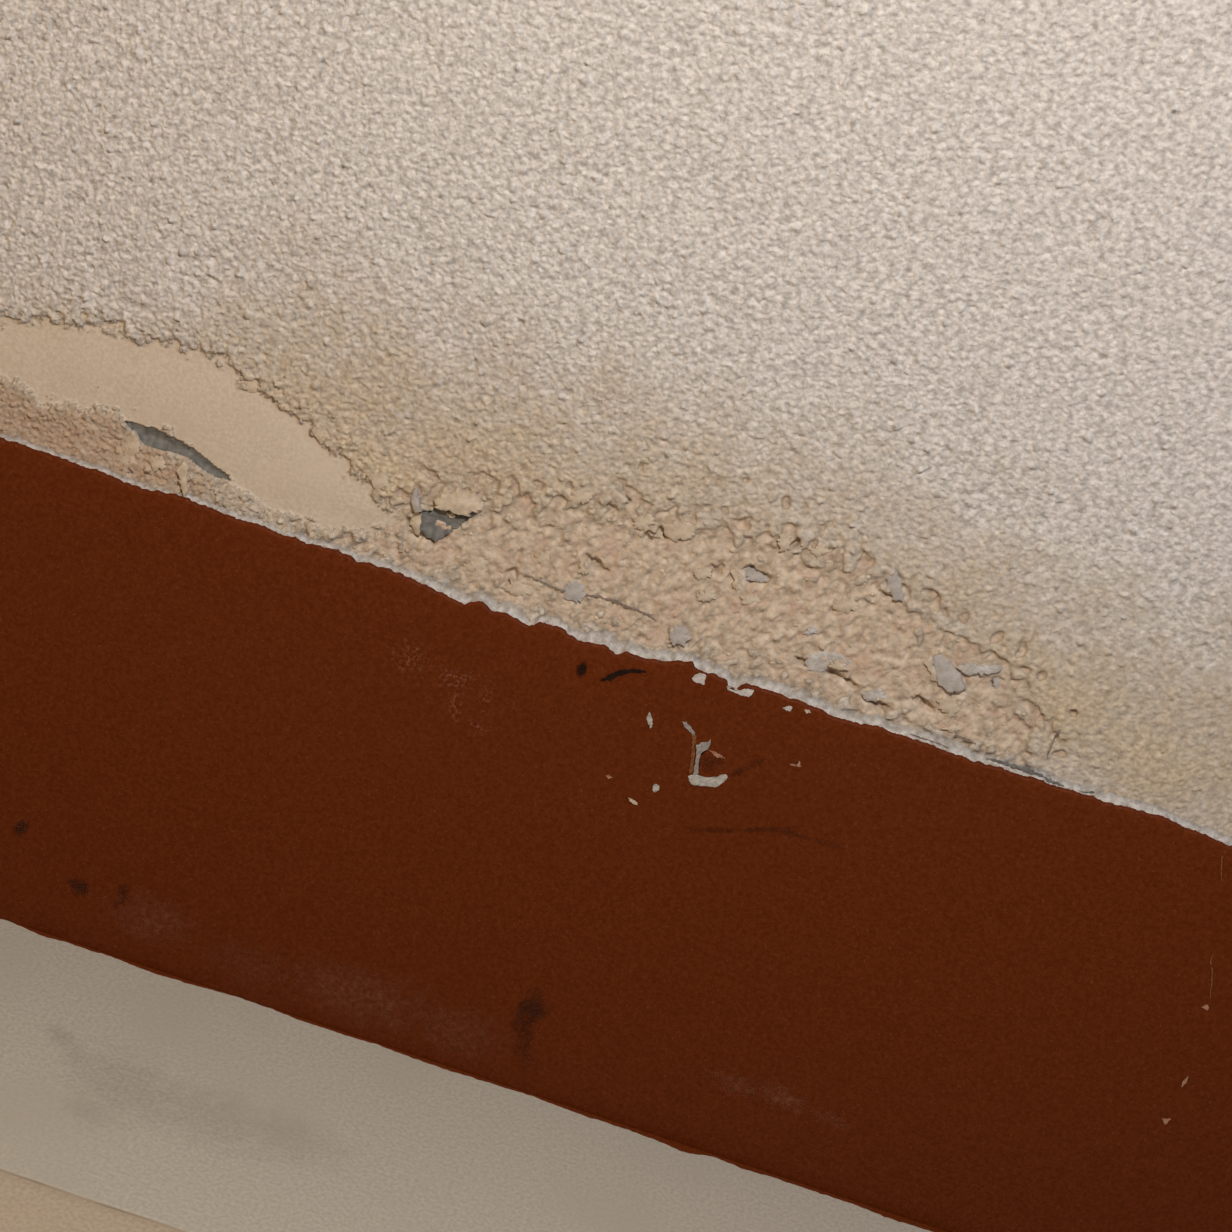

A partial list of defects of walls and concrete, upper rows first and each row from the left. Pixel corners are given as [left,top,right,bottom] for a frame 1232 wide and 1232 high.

spalling [0,311,1066,769]
peeling [682,721,728,787]